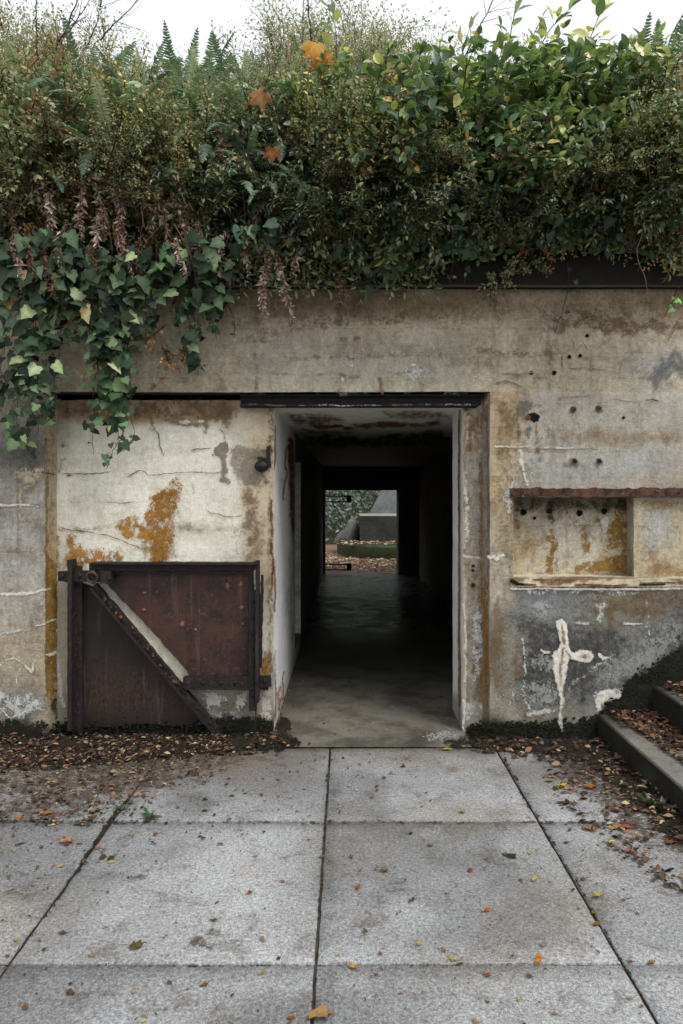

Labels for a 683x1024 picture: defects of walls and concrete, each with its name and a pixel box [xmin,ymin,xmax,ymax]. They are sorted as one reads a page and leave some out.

water stain [650,351,683,389]
crack [62,421,226,477]
crack [61,527,144,549]
corrosion [44,438,184,700]
corrosion [545,529,559,575]
water stain [462,405,683,739]
corrosion [575,500,627,575]